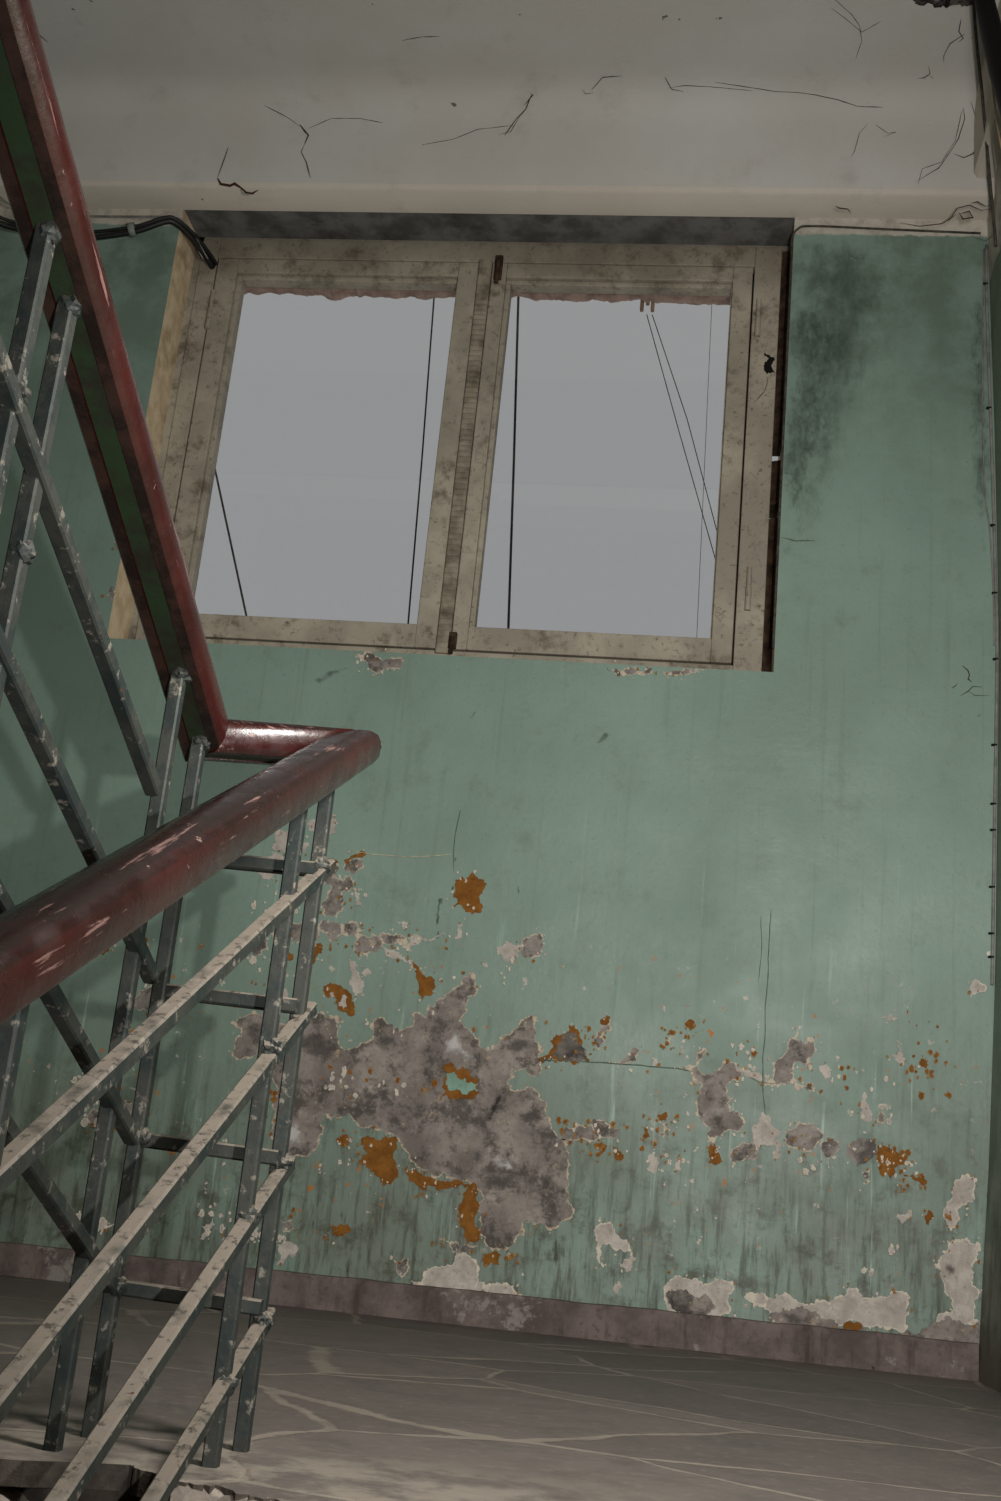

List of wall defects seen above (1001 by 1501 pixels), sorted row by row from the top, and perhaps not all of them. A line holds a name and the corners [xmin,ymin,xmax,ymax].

spalling [913,0,972,8]
peeling [251,815,339,914]
peeling [968,979,987,996]
flaking render [228,1011,286,1060]
flaking render [247,849,956,1295]
peeling [199,1202,232,1240]
flaking render [744,1172,982,1344]